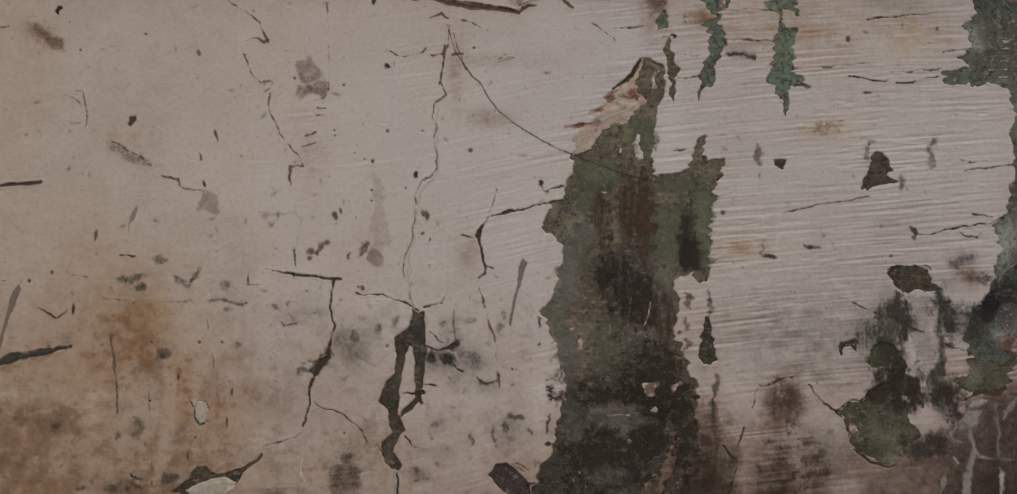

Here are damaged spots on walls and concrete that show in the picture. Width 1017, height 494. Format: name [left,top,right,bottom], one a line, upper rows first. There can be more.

peeling [698,0,756,100]
peeling [764,0,805,116]
crack [272,0,536,494]
crack [461,185,564,341]
peeling [489,10,725,494]
peeling [861,152,898,191]
peeling [887,256,940,293]
peeling [941,0,1017,393]
peeling [838,339,858,355]
peeling [838,343,921,464]
damp [856,266,1017,494]
peeling [172,454,263,494]